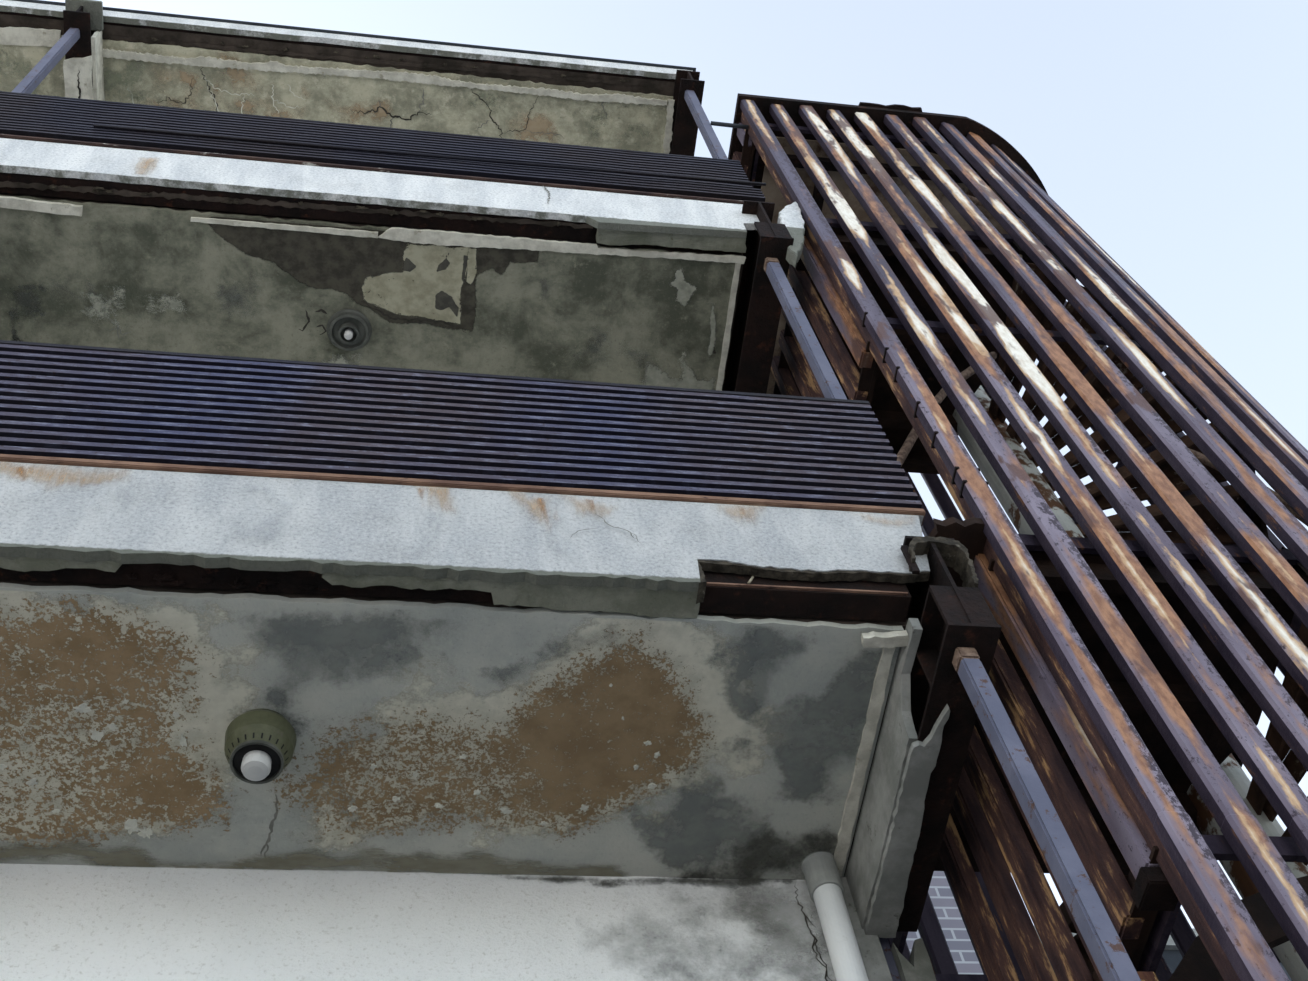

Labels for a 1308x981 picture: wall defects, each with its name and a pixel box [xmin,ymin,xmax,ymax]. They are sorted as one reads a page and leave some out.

crack [127,68,302,114]
crack [351,88,431,128]
crack [471,89,562,138]
flaking render [0,181,593,333]
leakage [260,614,441,683]
leakage [710,627,803,721]
leakage [775,652,880,800]
leakage [518,779,837,961]
crack [794,886,832,981]